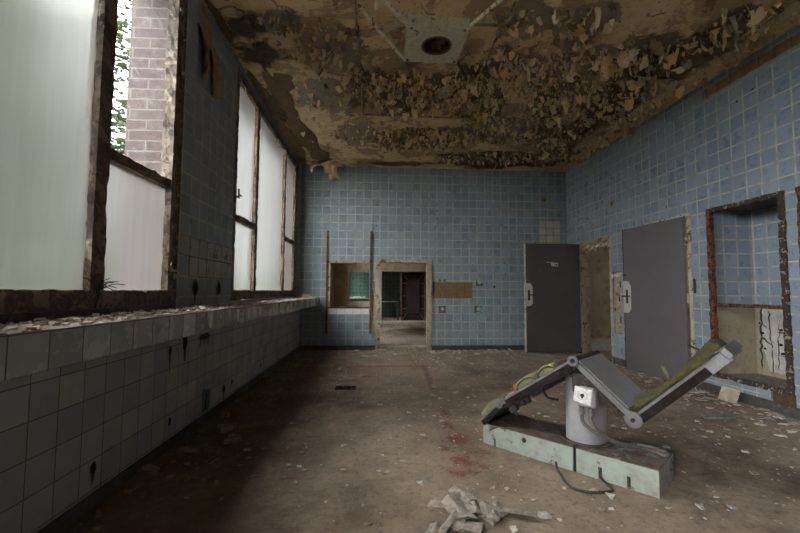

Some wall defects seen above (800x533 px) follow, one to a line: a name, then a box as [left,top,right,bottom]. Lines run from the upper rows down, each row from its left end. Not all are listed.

peeling [254,0,800,169]
crack [759,308,786,375]